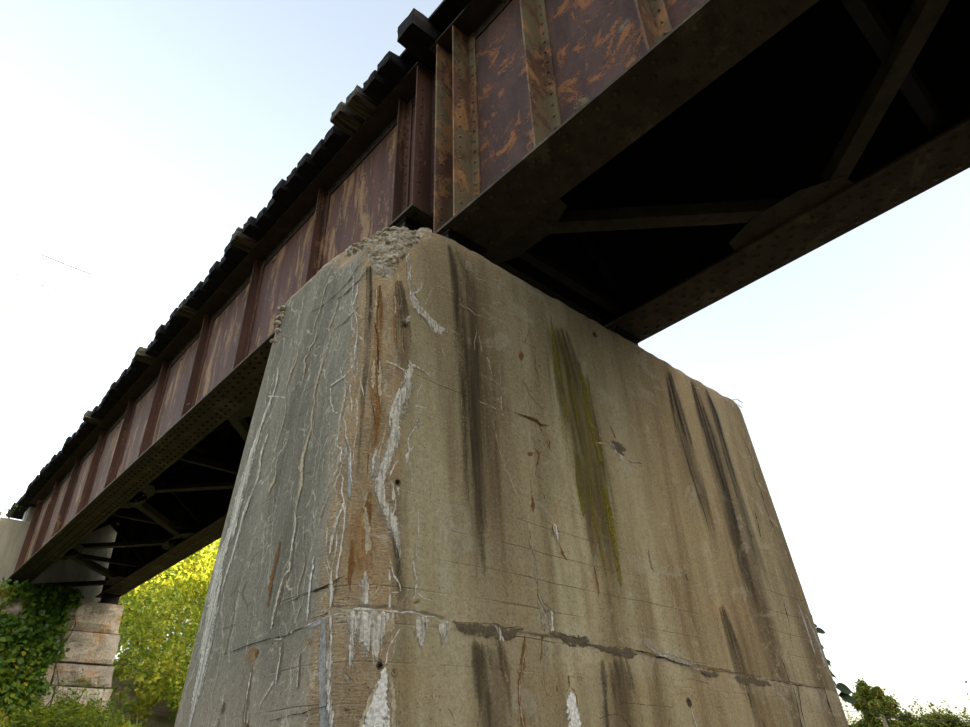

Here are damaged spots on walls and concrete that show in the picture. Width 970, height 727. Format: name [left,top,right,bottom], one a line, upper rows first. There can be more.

rust [373,285,396,329]
spalling [342,226,432,296]
rust [371,359,383,443]
rust [347,491,372,590]
efflorescence [306,360,451,727]
crack [211,262,590,727]
leakage [576,454,622,586]
efflorescence [566,675,582,727]